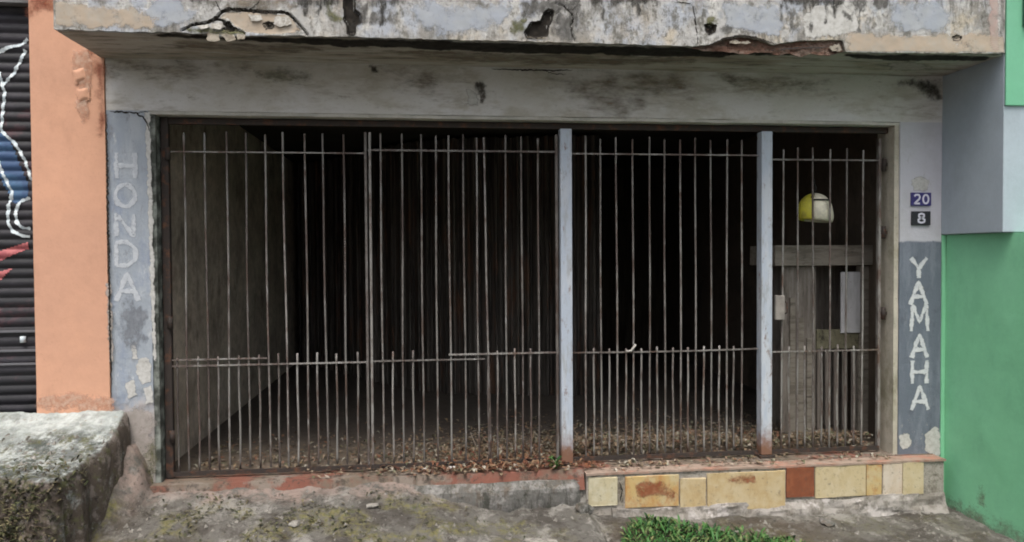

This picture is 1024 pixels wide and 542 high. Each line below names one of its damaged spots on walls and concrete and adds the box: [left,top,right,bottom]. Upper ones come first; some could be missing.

peeling [55,0,299,42]
crack [182,0,308,36]
hole [524,8,555,39]
peeling [692,0,1004,71]
damp [157,0,794,112]
mould [907,79,941,99]
peeling [125,112,156,469]
peeling [899,433,912,449]
peeling [925,427,940,456]
corrosion [636,481,675,498]